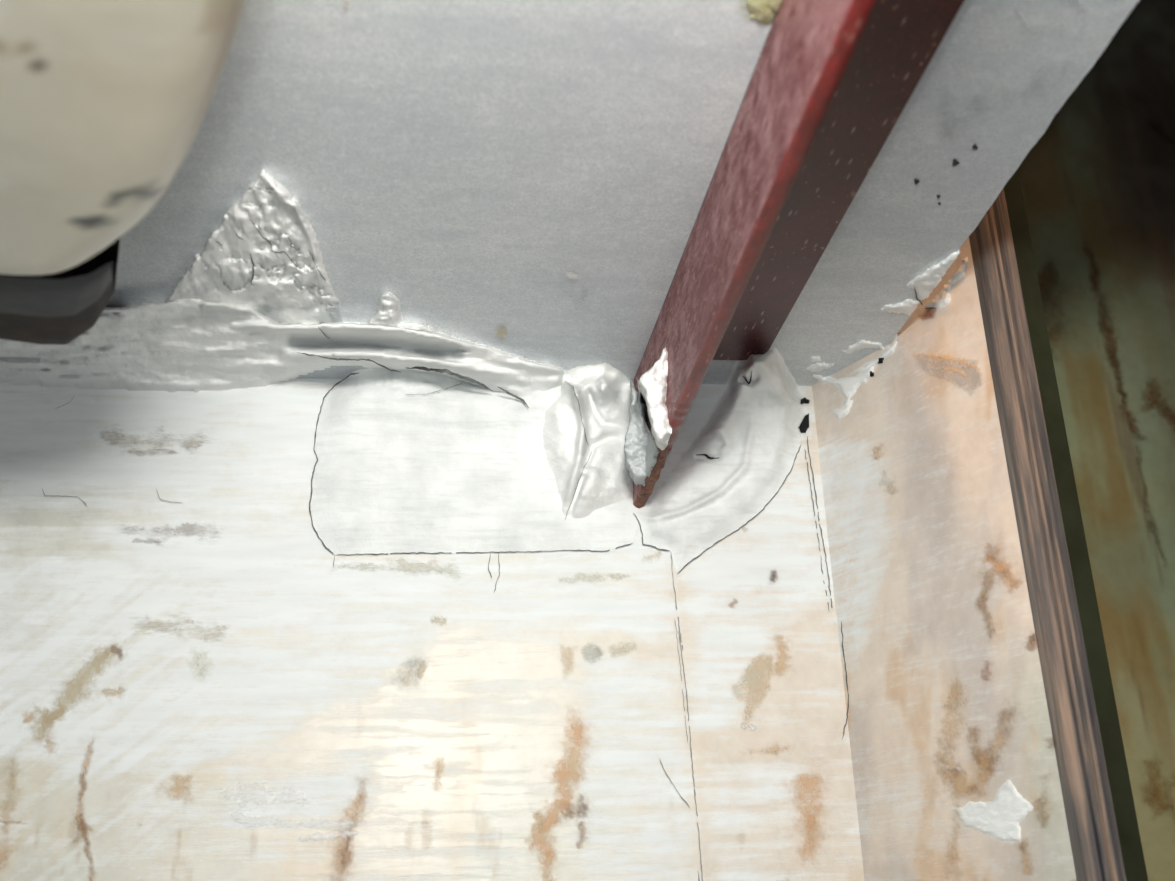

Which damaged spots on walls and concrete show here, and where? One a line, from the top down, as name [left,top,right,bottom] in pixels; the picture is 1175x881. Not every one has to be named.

crack [216,220,327,286]
flaking render [881,250,968,319]
flaking render [806,334,898,419]
crack [297,328,849,881]
corrosion [25,647,122,739]
corrosion [338,795,363,866]
corrosion [532,725,586,867]
flaking render [951,780,1033,843]